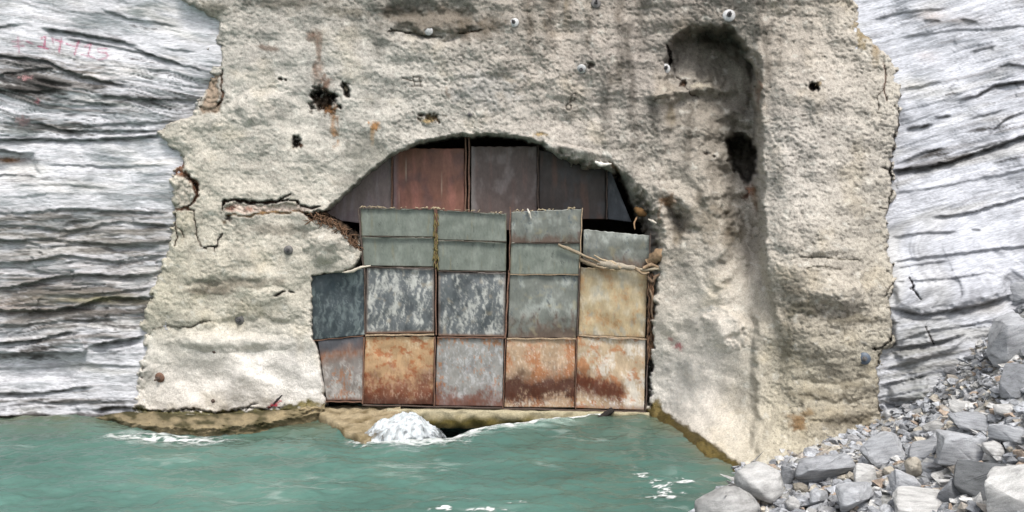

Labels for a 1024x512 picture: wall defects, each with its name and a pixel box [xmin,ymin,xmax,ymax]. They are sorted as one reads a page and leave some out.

spalling [195,72,224,113]
spalling [311,82,349,115]
crack [174,194,320,251]